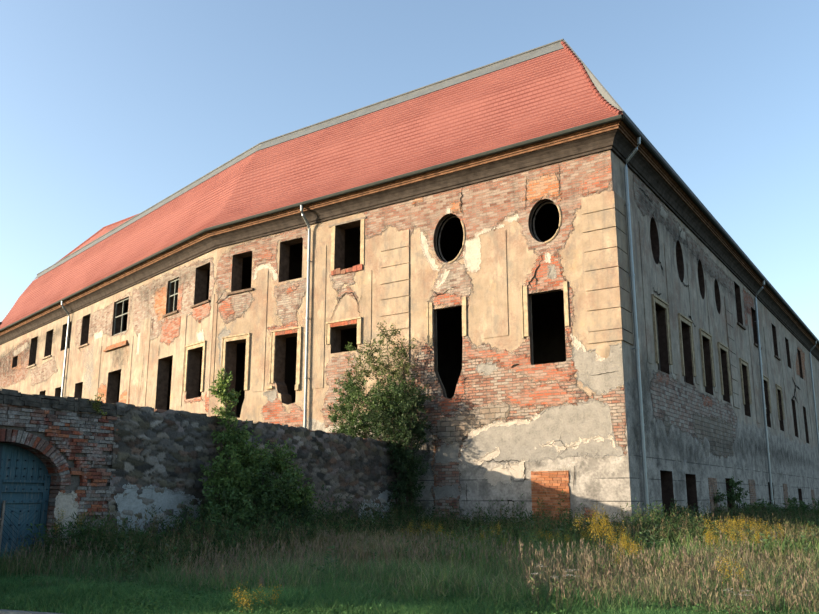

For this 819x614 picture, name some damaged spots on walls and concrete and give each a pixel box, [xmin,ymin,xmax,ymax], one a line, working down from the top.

spalling [75,226,308,370]
spalling [329,272,358,302]
spalling [364,151,627,522]
spalling [261,388,304,427]
peeling [114,483,202,534]